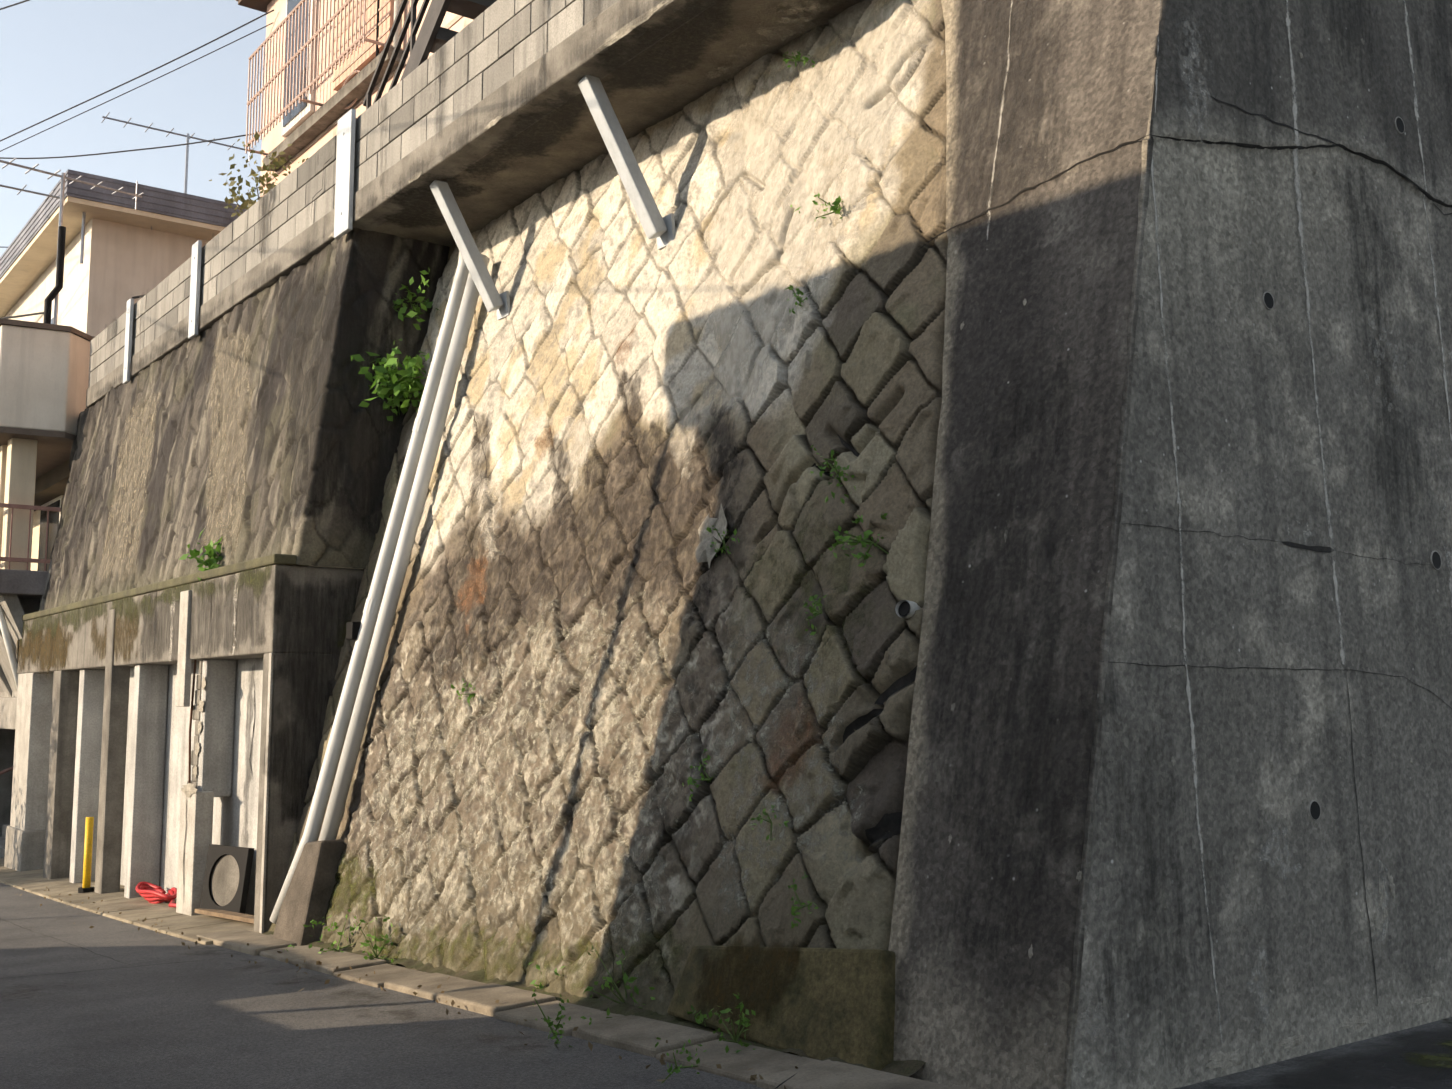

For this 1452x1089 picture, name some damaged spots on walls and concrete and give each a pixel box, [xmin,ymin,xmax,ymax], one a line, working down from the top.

leakage [359,46,586,227]
crack [921,94,1452,248]
leakage [415,0,920,707]
crack [1124,523,1430,565]
crack [1083,660,1452,1003]